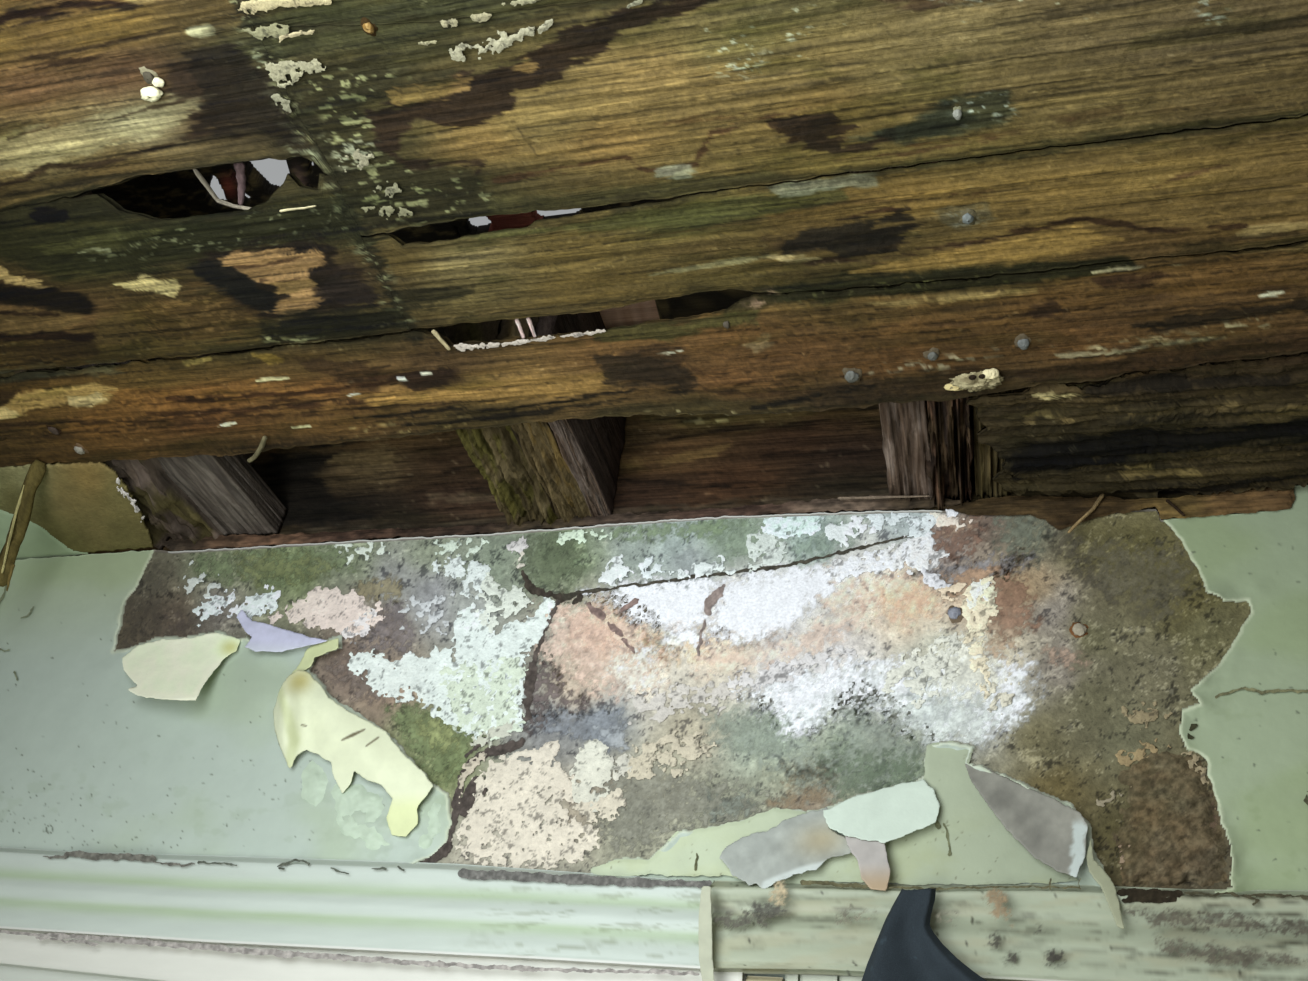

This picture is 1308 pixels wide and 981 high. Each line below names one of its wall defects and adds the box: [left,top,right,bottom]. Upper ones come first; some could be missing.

crack [197,859,237,867]
crack [277,535,913,874]
peeling [116,511,1251,929]
damp [178,509,1190,857]
crack [1180,717,1198,739]
crack [1215,687,1308,699]